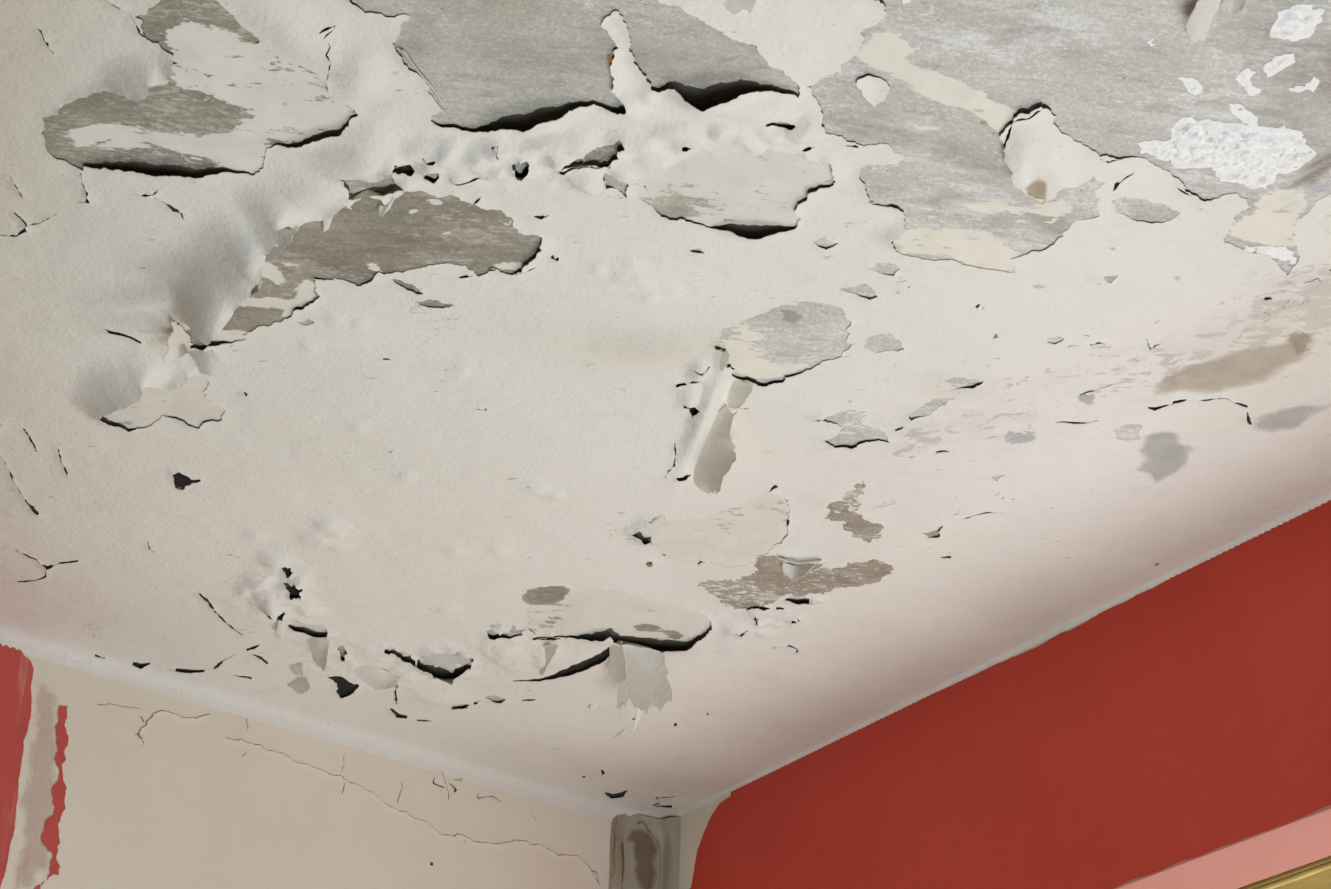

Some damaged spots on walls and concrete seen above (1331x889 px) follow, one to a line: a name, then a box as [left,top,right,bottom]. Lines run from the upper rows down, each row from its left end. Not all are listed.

peeling [32,0,542,435]
peeling [333,0,1331,494]
crack [88,590,678,886]
peeling [243,494,894,738]
damp [631,831,655,889]
peeling [825,481,897,542]